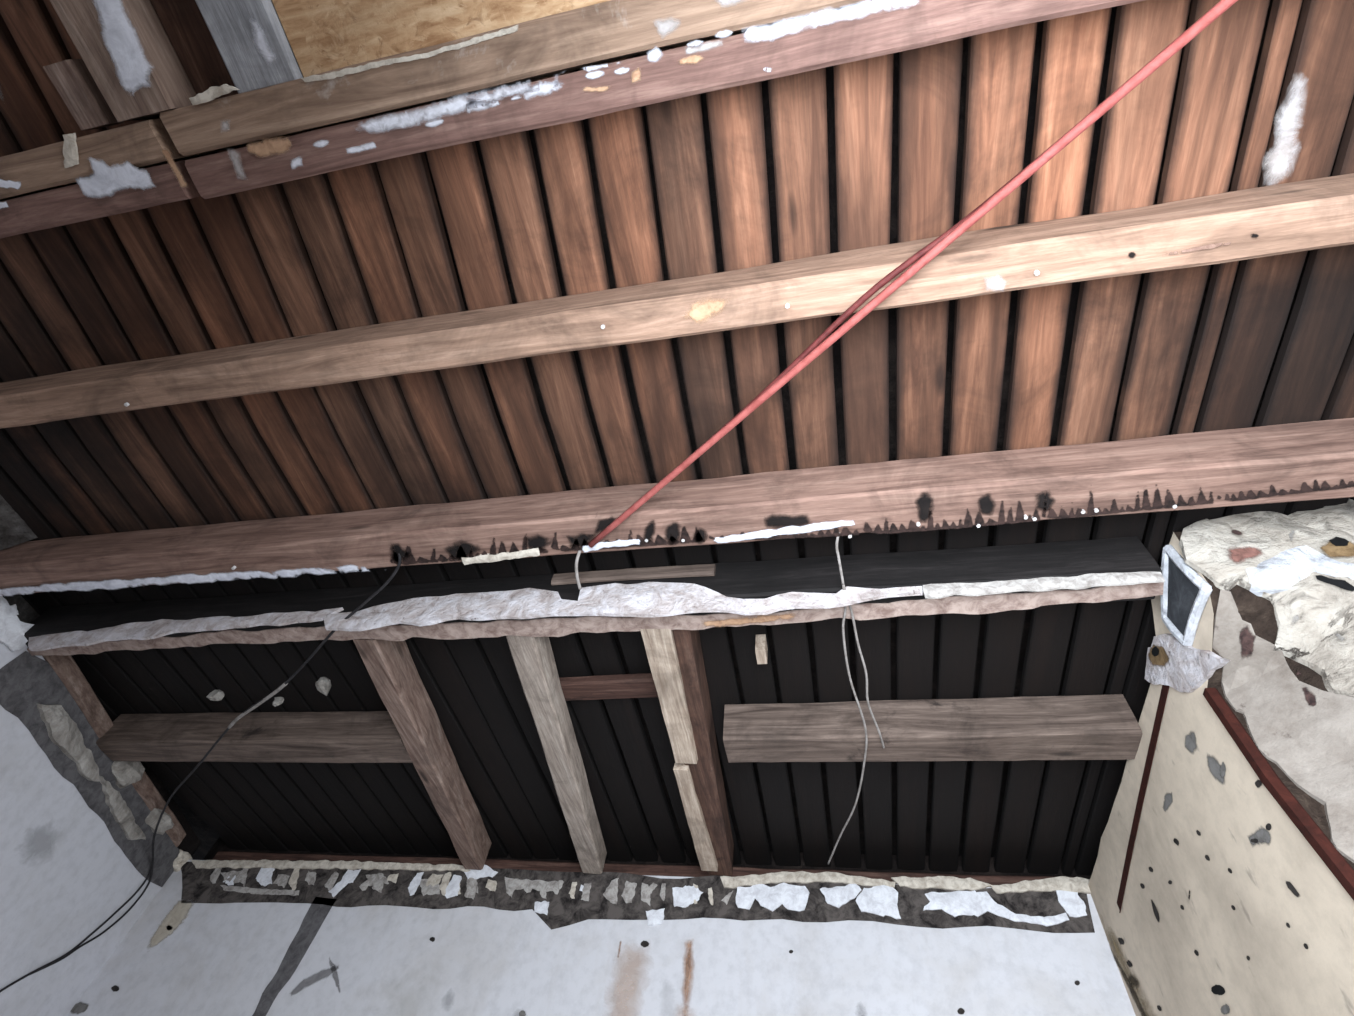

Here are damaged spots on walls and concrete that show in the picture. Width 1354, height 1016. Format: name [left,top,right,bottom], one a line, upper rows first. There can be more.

spalling [1145,499,1354,863]
peeling [0,596,1095,947]
spalling [1140,867,1159,922]
crack [291,960,340,994]
rust [684,943,692,1002]
damp [1110,936,1149,1016]
spalling [1211,985,1230,1014]